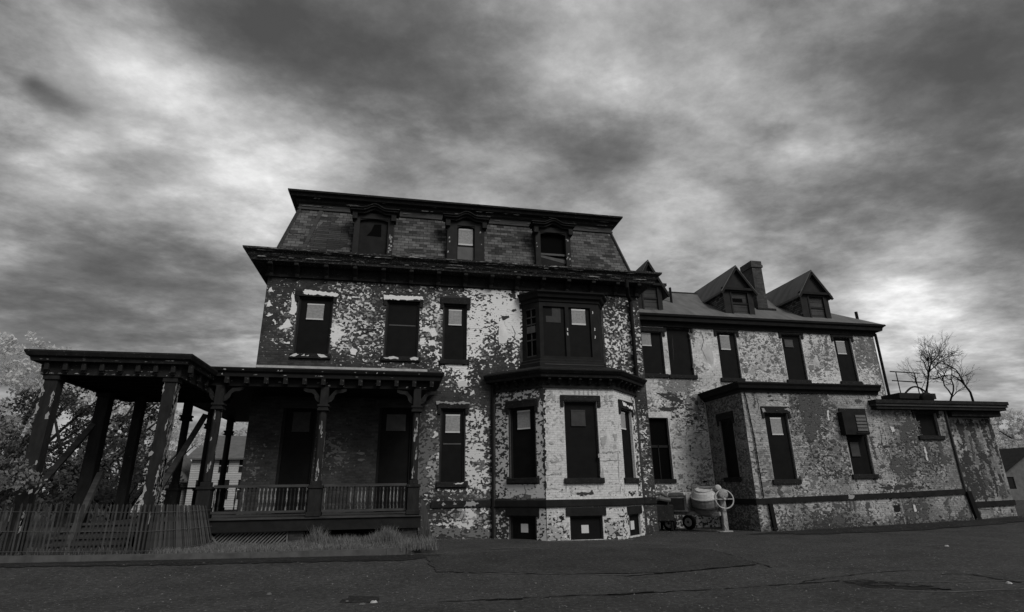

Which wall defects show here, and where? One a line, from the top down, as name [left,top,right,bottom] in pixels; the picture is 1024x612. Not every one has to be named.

peeling [262,278,300,357]
peeling [313,280,594,539]
peeling [603,297,644,376]
peeling [604,334,1014,539]